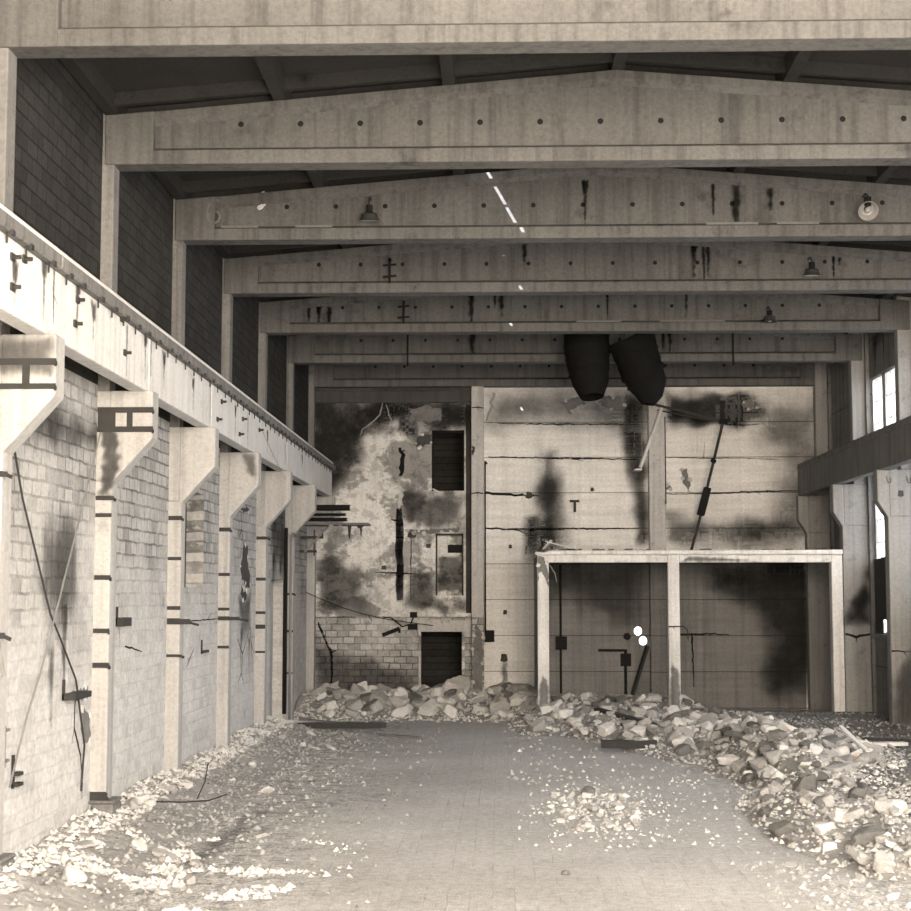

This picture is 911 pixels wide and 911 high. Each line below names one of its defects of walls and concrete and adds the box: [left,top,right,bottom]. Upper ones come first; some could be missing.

leakage [732,185,740,222]
leakage [691,246,710,279]
leakage [37,407,119,494]
leakage [315,403,471,490]
leakage [402,493,459,527]
crack [472,490,539,498]
leakage [318,558,359,610]
leakage [408,558,461,610]